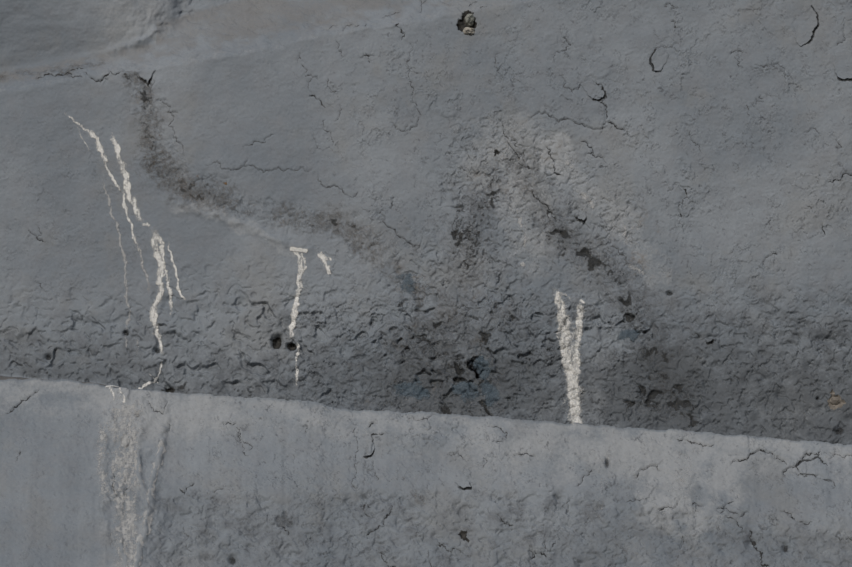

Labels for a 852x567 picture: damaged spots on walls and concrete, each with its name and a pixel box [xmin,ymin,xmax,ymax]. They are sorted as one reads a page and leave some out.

crack [38,68,183,148]
crack [386,1,423,132]
spalling [456,10,477,35]
crack [535,44,628,158]
crack [490,125,557,221]
damp [69,116,186,391]
damp [546,217,644,284]
efflorescence [288,247,332,385]
damp [555,292,585,423]
damp [618,293,668,362]
efflorescence [99,385,166,567]
crack [732,442,851,487]